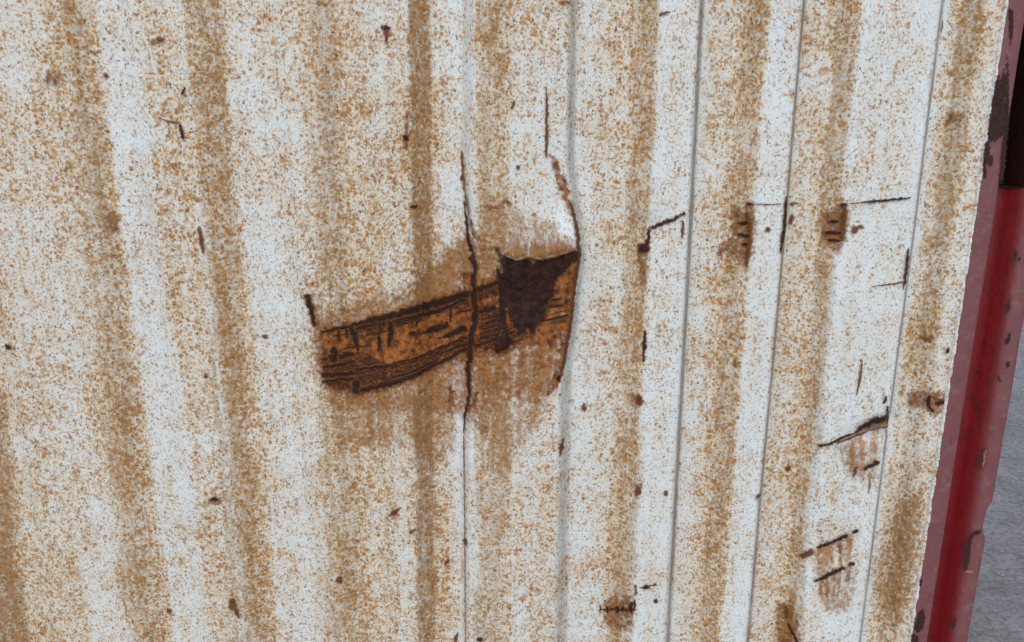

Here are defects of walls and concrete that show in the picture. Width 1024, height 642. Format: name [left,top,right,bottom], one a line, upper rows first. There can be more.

rust [402,0,433,300]
crack [544,87,582,396]
rust [717,202,770,267]
rust [819,206,864,252]
crack [463,201,481,642]
rust [908,391,945,418]
rust [841,432,883,493]
rust [799,533,855,610]
rust [599,595,636,631]